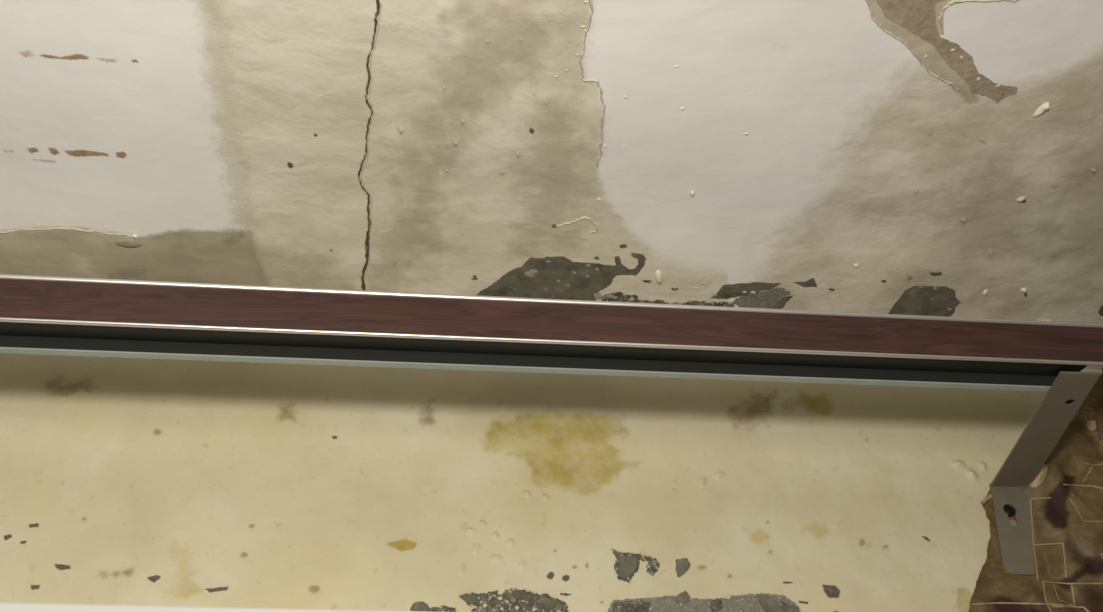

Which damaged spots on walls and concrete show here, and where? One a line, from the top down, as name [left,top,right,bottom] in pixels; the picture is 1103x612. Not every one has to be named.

peeling [865,0,1018,104]
corrosion [28,148,126,158]
crack [358,0,383,290]
leakage [0,0,1103,324]
spalling [472,244,835,309]
spalling [888,272,961,317]
leakage [473,404,647,504]
spalling [611,549,660,582]
spalling [676,558,690,577]
spalling [410,572,571,612]
spalling [608,591,801,612]